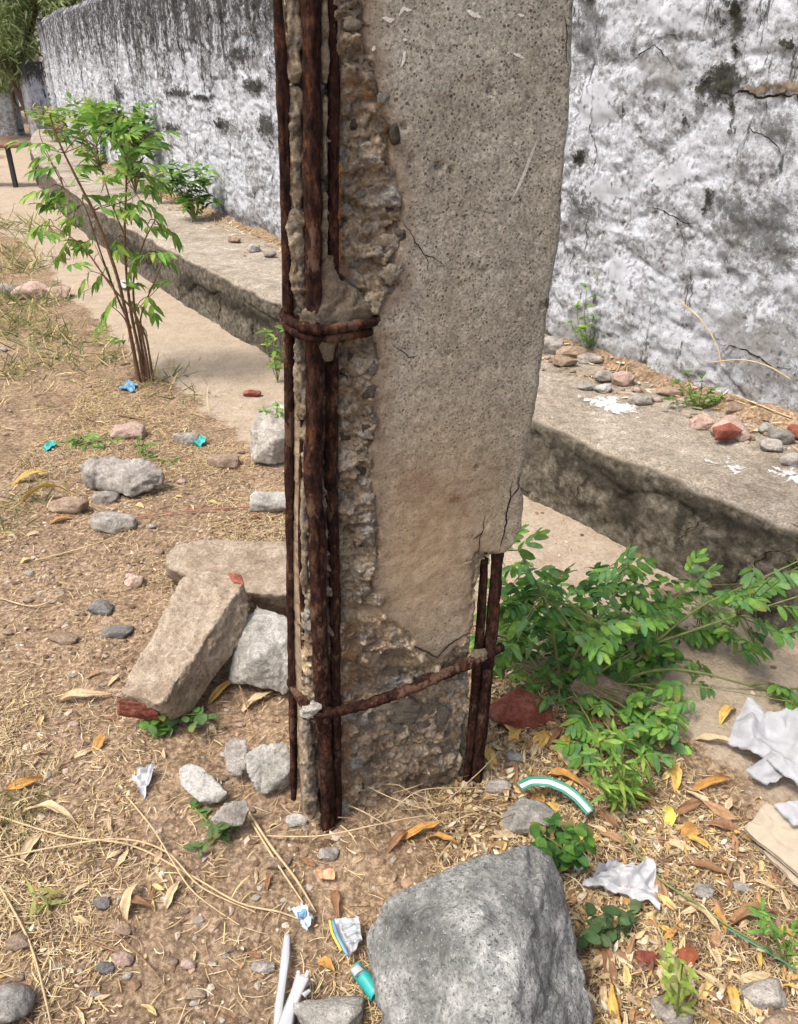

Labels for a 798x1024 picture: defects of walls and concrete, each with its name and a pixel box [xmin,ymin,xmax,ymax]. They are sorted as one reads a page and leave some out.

leakage [55,0,278,144]
leakage [681,0,797,154]
leakage [210,205,278,236]
spalling [273,0,406,325]
spalling [283,329,504,833]
crack [475,470,624,553]